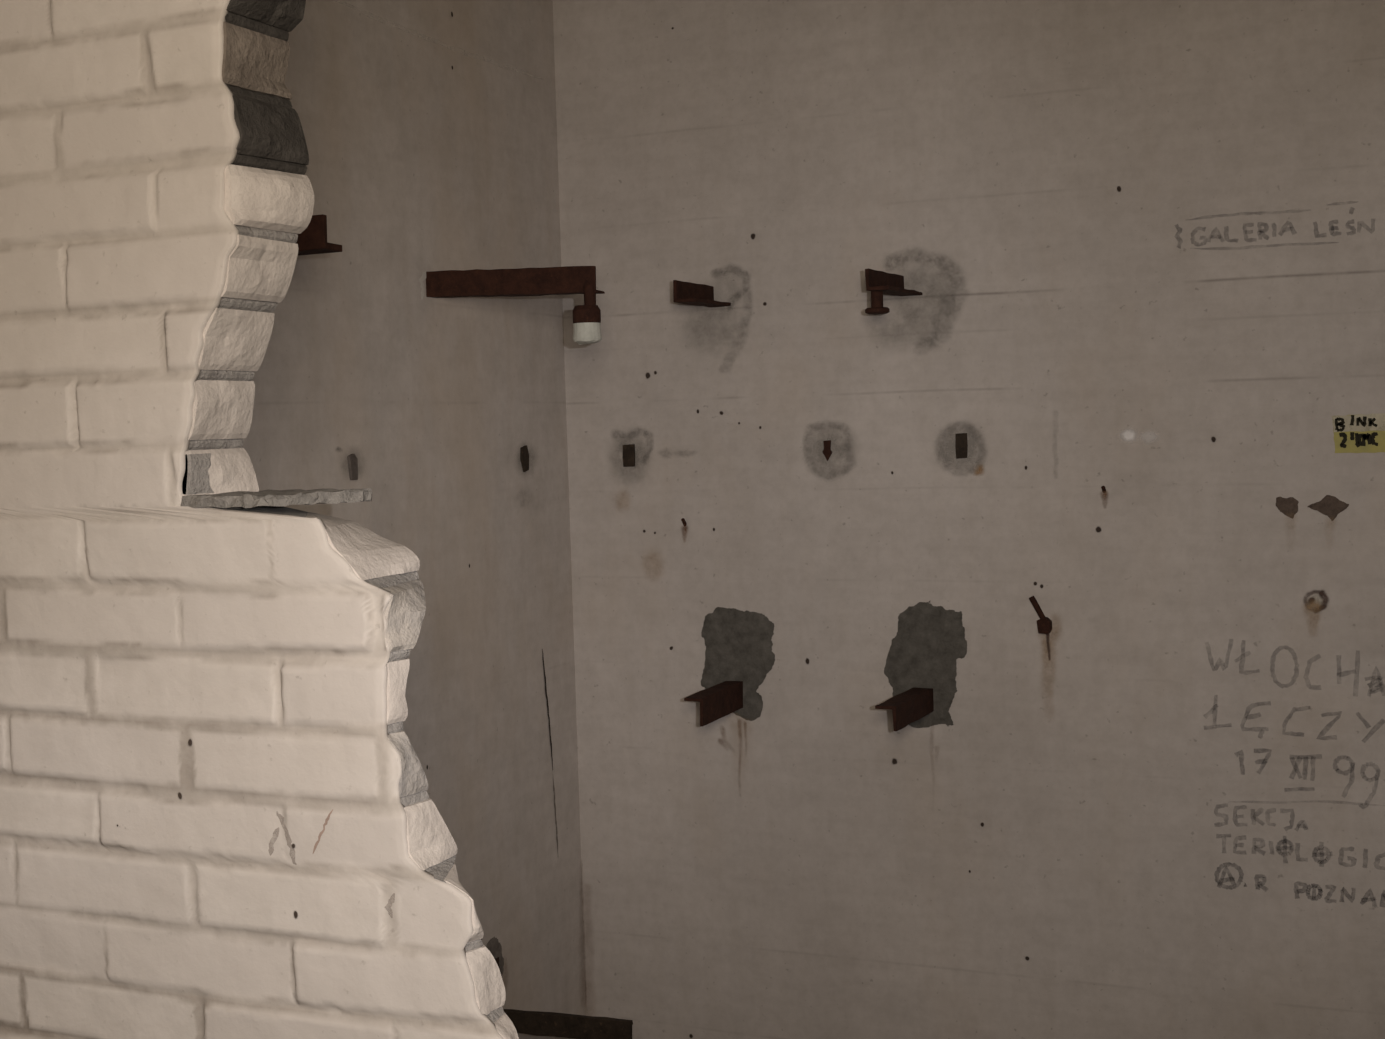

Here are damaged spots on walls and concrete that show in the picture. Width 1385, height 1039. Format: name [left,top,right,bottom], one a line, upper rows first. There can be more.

spalling [180,0,519,1039]